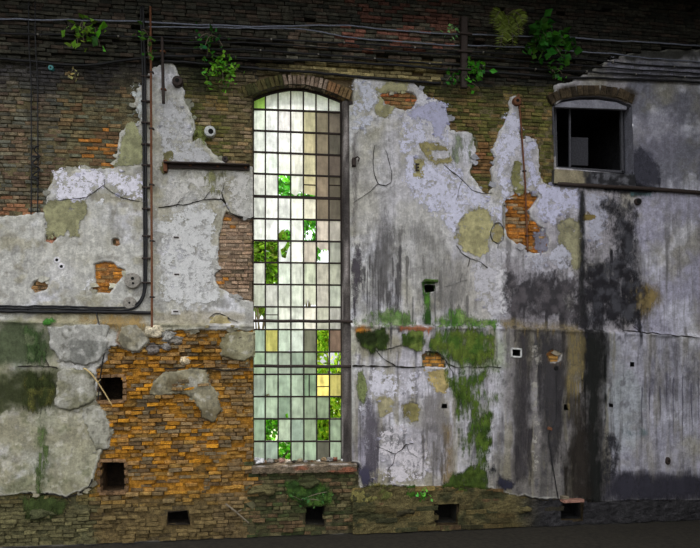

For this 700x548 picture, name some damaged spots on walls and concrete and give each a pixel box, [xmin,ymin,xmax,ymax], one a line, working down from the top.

crack [58,181,137,201]
spalling [0,50,265,311]
crack [158,182,254,219]
crack [355,145,392,202]
spalling [349,75,608,318]
water stain [351,226,436,342]
water stain [462,146,700,504]
water stain [448,356,477,423]
spalling [0,327,360,547]
water stain [359,399,379,486]
water stain [422,394,446,481]